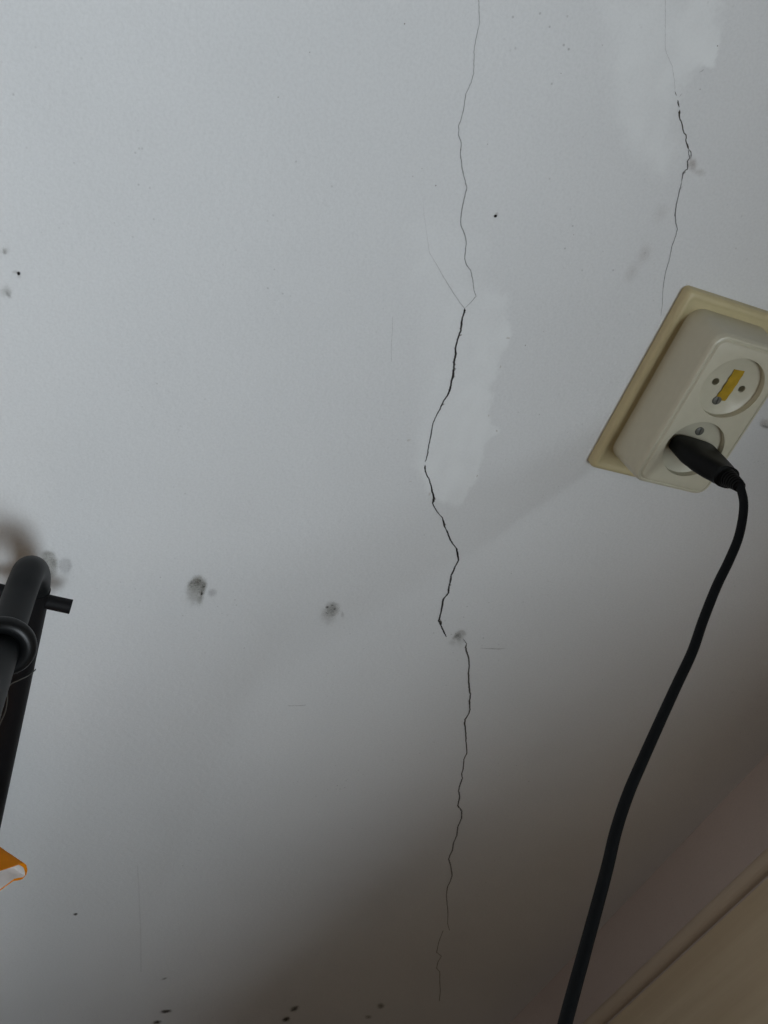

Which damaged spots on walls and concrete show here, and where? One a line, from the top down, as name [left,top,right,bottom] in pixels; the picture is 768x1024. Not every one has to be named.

crack [424,0,480,994]
crack [661,92,692,311]